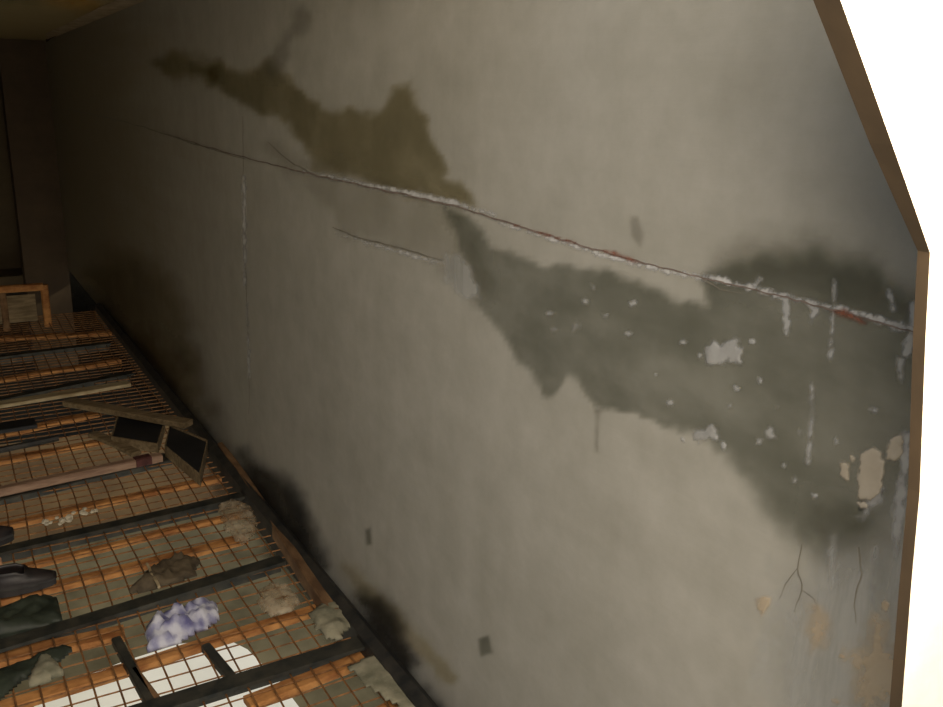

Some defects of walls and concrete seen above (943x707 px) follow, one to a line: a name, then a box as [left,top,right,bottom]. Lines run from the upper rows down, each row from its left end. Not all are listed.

crack [67,109,915,378]
peeling [699,340,742,364]
crack [805,421,813,463]
peeling [840,436,903,508]
damp [893,434,909,543]